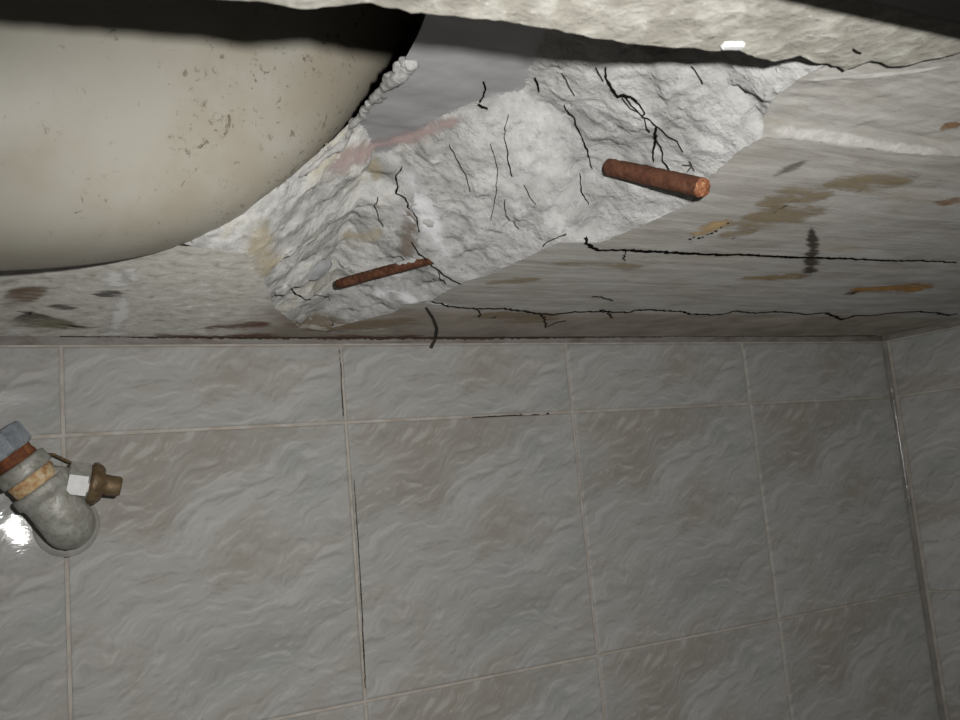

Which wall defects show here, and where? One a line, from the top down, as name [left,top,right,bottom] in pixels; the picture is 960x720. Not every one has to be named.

crack [490,115,536,229]
spalling [184,13,960,328]
crack [561,73,593,205]
crack [595,67,695,172]
crack [374,167,959,328]
water stain [689,175,912,240]